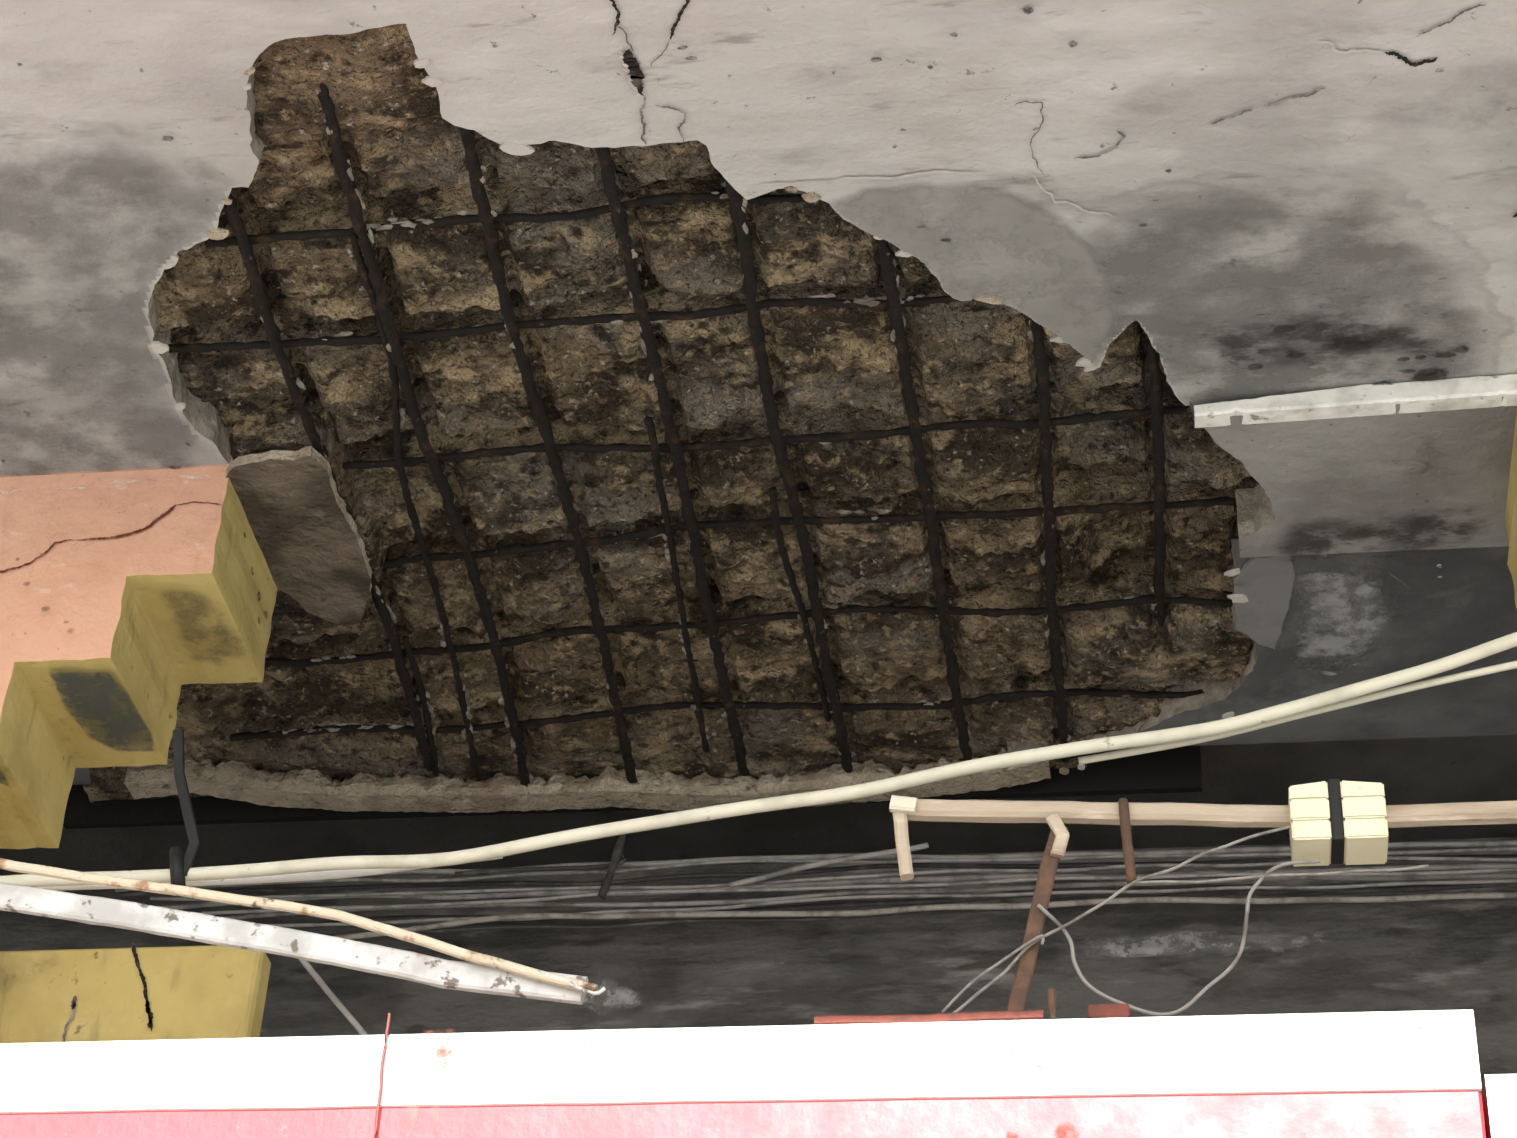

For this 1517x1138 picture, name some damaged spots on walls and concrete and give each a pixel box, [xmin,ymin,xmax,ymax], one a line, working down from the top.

crack [610,0,690,145]
crack [1211,87,1326,124]
crack [1318,4,1484,67]
leakage [0,158,209,477]
leakage [1096,201,1469,403]
spalling [63,24,1295,829]
crack [0,501,221,573]
crack [132,941,153,1032]